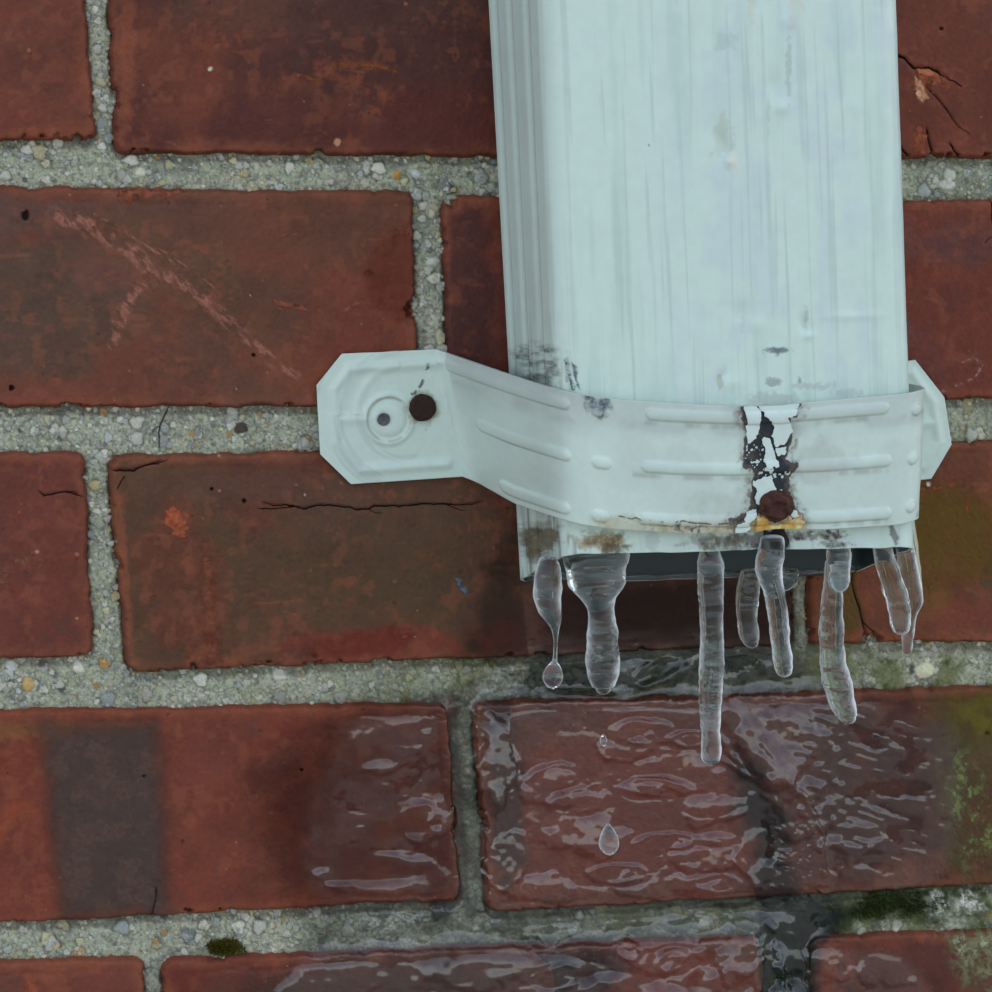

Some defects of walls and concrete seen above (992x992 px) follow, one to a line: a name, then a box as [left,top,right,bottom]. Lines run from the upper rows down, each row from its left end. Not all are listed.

crack [898,54,969,157]
peeling [728,403,806,533]
crack [40,490,81,498]
crack [259,502,478,513]
rust [586,516,736,550]
rust [748,507,804,532]
leakage [527,657,598,693]
leakage [615,651,699,694]
leakage [723,649,791,691]
leakage [825,717,944,875]
leakage [737,762,796,898]
leakage [759,895,854,992]